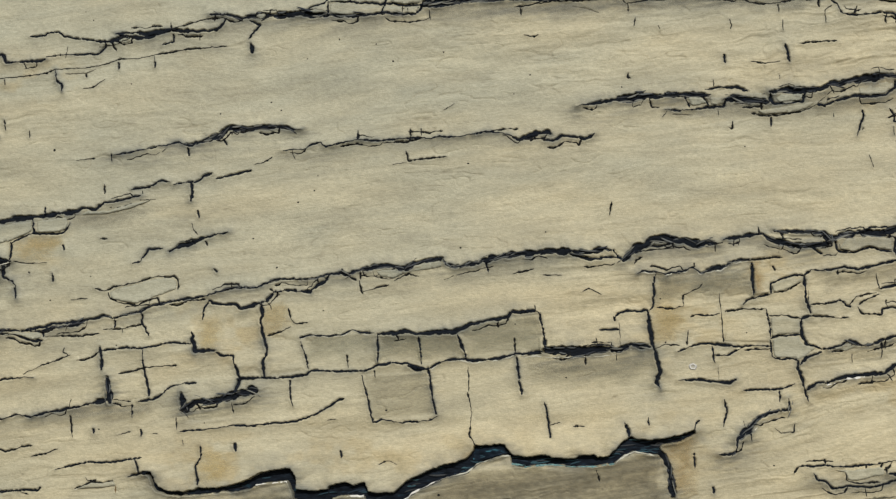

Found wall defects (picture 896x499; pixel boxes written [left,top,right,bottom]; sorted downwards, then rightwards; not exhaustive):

crack [0,0,599,91]
crack [751,43,790,64]
crack [724,0,896,23]
crack [579,67,896,136]
crack [0,124,896,499]